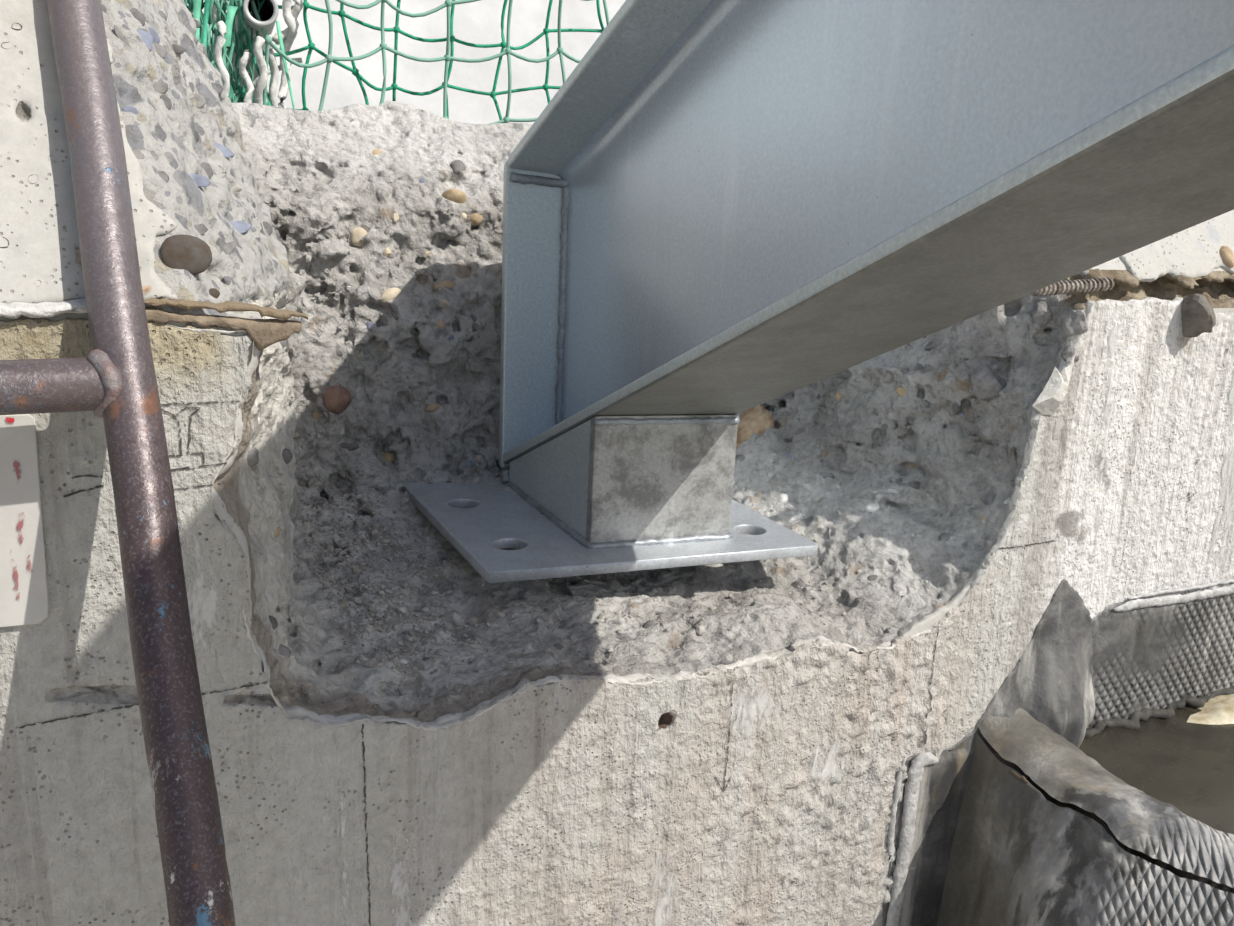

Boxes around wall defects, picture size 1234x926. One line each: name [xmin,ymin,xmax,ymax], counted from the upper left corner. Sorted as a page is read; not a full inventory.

spalling [101,0,1115,731]